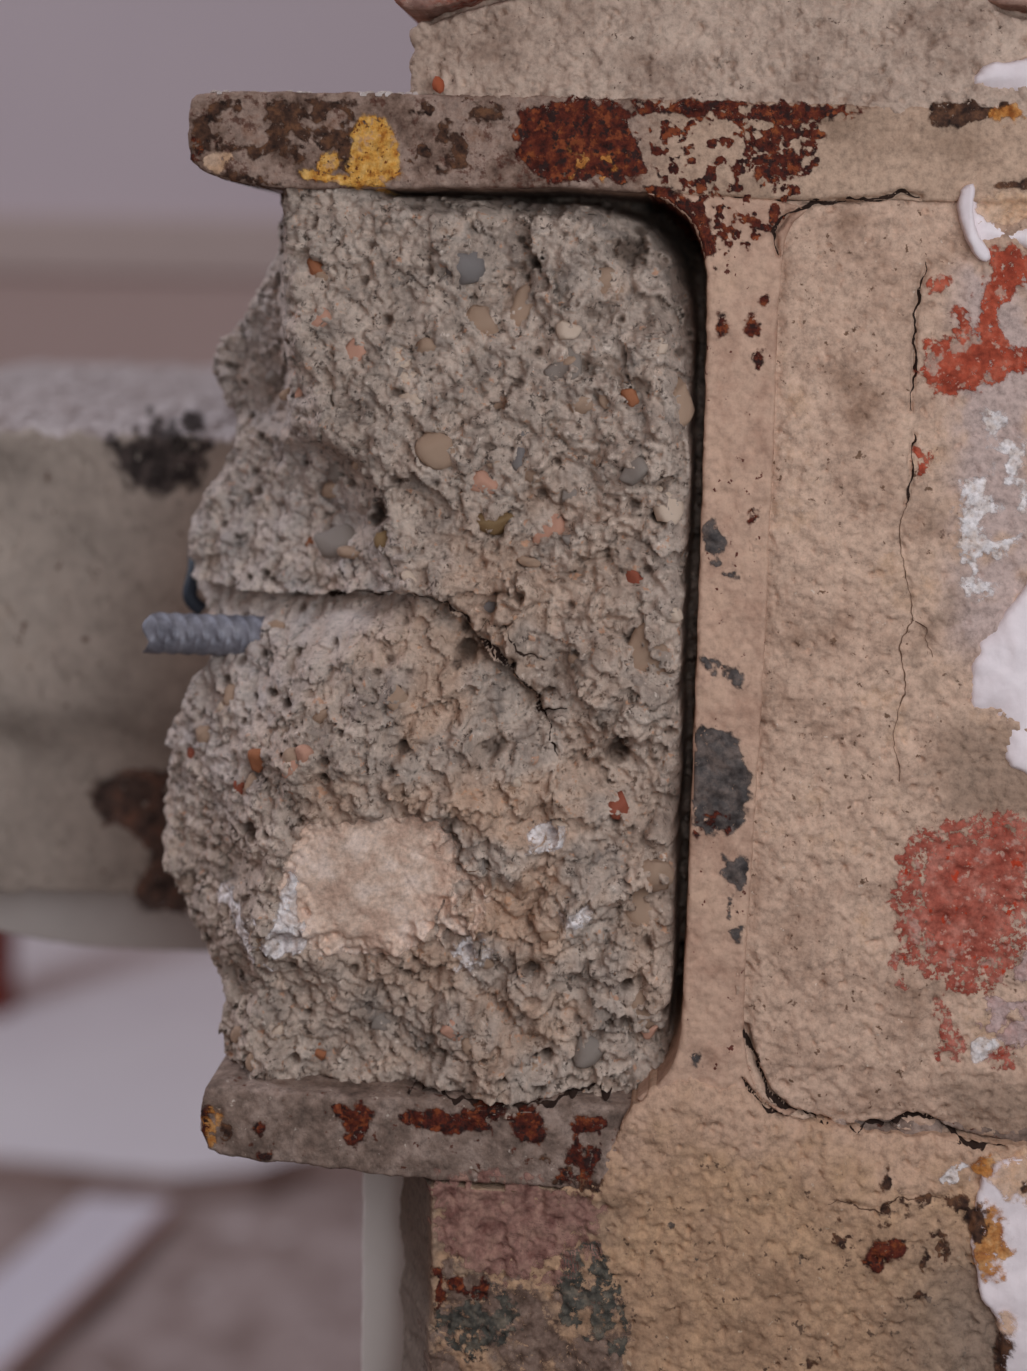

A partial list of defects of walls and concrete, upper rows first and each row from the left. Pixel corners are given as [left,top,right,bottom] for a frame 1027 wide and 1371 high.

rust [190,98,357,197]
rust [404,95,863,270]
rust [716,294,769,371]
peeling [914,184,1027,397]
crack [893,262,933,782]
peeling [912,446,934,476]
spalling [91,113,753,1120]
crack [297,590,567,755]
peeling [886,809,1027,1070]
rust [331,1100,375,1150]
rust [398,1100,608,1193]
crack [743,1029,1002,1151]